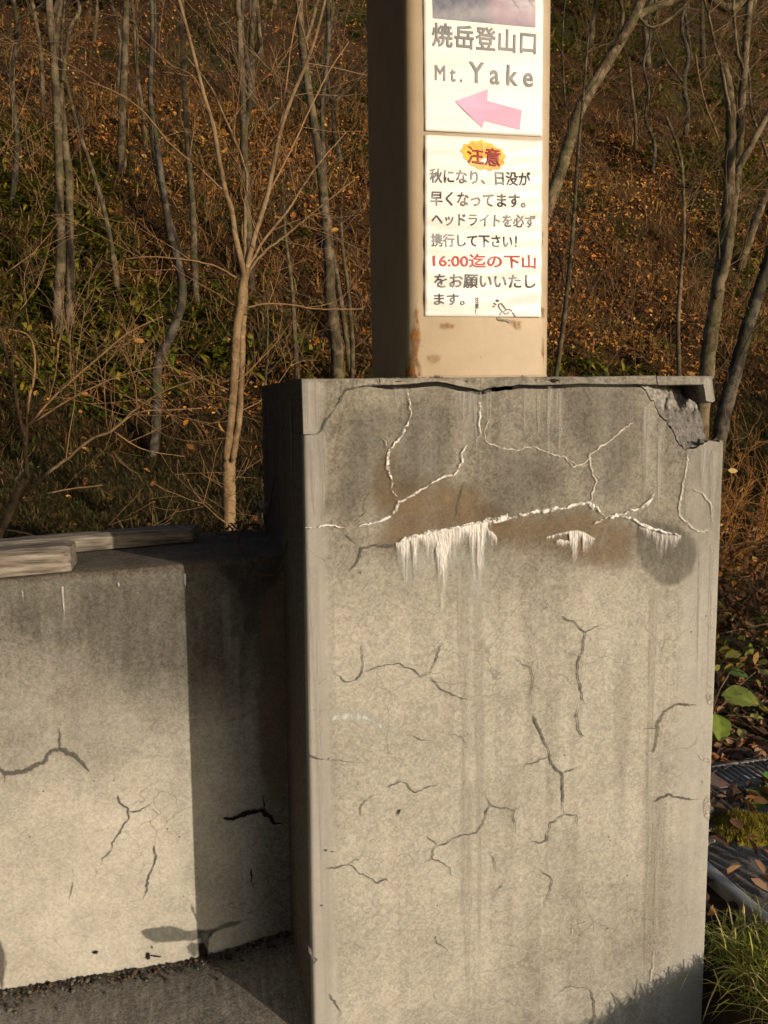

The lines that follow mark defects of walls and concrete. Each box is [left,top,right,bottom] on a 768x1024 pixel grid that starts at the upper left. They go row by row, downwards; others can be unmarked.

corrosion [405,310,420,377]
spalling [642,386,724,449]
crack [306,374,713,572]
leakage [381,463,625,582]
crack [318,639,468,700]
crack [513,597,600,741]
crack [0,729,89,782]
crack [223,794,285,825]
crack [424,656,580,878]
crack [646,703,694,753]
crack [654,793,696,802]
crack [69,796,158,898]